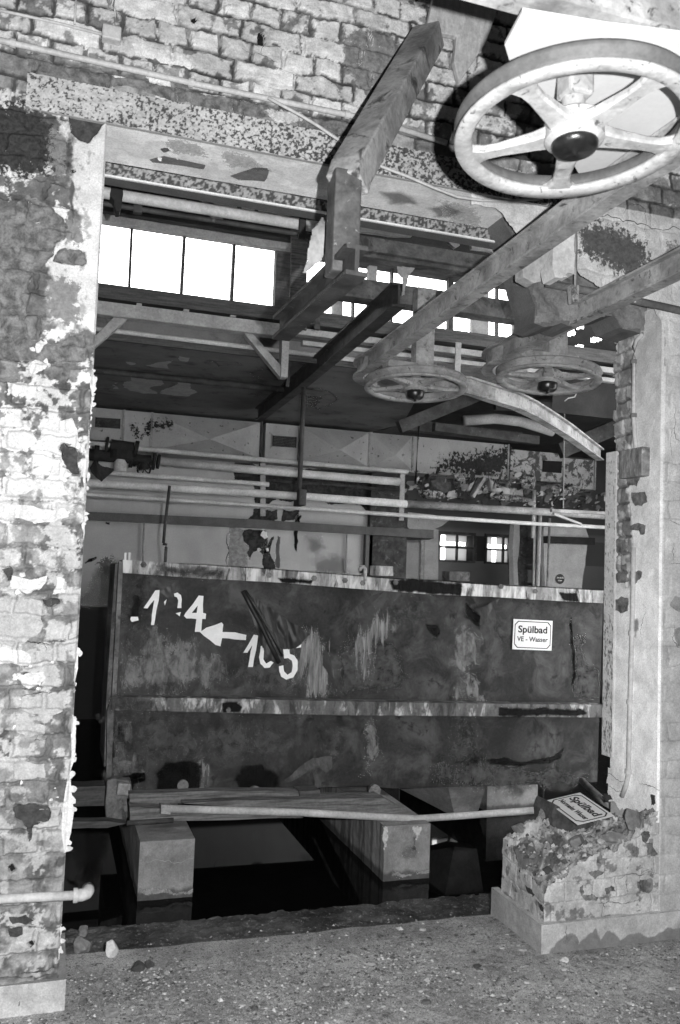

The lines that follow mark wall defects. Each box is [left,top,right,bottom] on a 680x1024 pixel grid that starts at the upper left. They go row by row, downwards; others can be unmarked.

flaking render [69,118,105,143]
leakage [577,218,652,276]
flaking render [0,195,97,524]
flaking render [626,478,647,506]
flaking render [616,523,646,584]
corrosion [559,592,579,602]
flaking render [615,596,629,613]
corrosion [390,578,486,701]
corrosion [498,618,599,717]
peeling [0,566,83,853]
spalling [624,808,657,857]
flaking render [8,915,33,937]